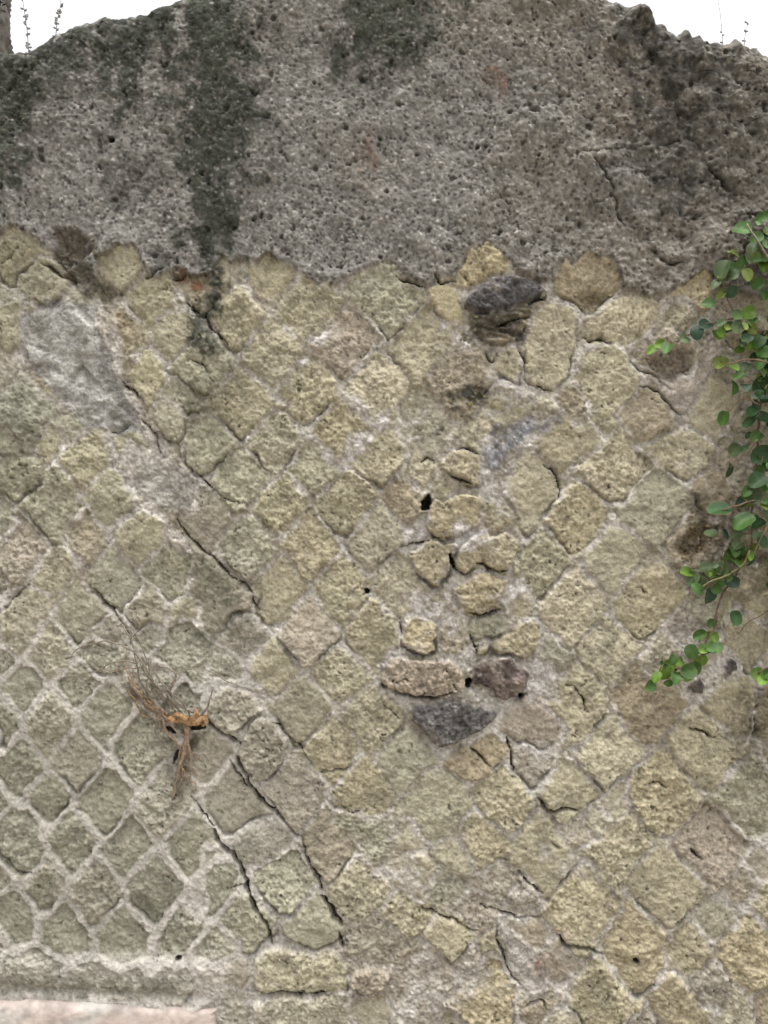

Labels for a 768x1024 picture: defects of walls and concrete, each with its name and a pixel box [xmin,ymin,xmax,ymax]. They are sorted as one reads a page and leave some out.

crack [580,138,724,226]
crack [180,523,257,605]
crack [191,796,272,933]
crack [208,719,344,944]